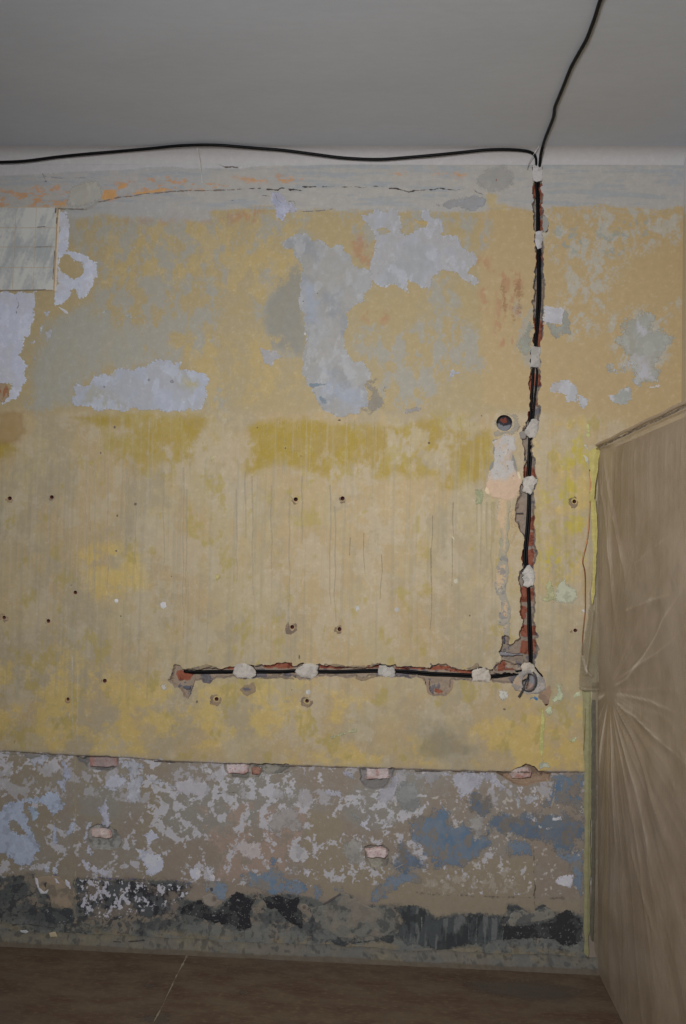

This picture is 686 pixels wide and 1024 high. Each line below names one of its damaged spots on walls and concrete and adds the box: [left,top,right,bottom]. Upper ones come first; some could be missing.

crack [58,166,482,212]
peeling [0,211,99,405]
peeling [281,167,512,417]
peeling [517,305,571,355]
peeling [606,309,675,405]
peeling [72,359,210,413]
peeling [550,378,588,409]
spalling [223,763,290,779]
spalling [359,767,395,790]
spalling [496,764,551,809]
spalling [364,844,389,871]
spalling [35,865,75,909]